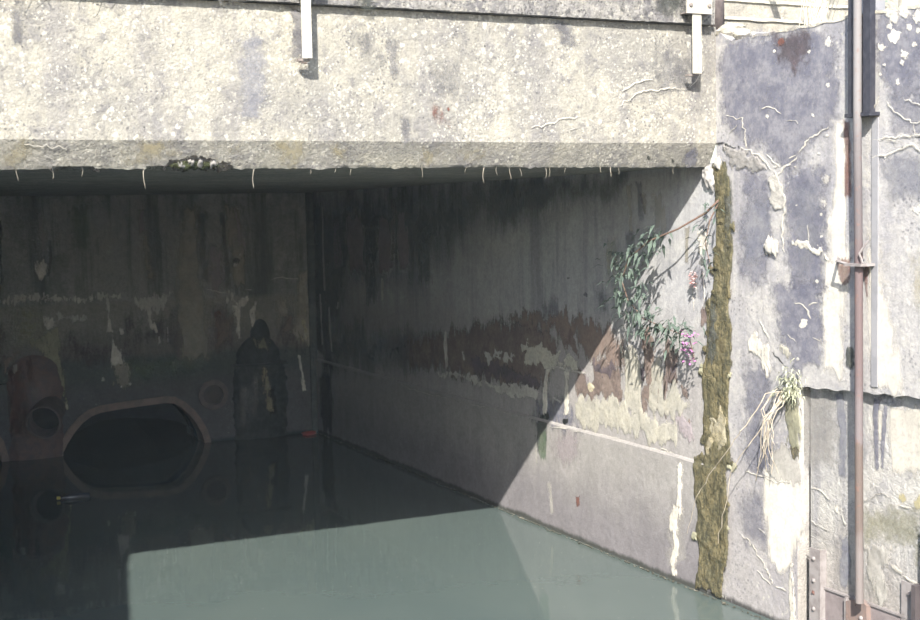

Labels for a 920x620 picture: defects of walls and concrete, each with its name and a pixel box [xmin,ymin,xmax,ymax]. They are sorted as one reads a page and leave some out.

crack [726,106,828,176]
crack [869,96,920,158]
damp [29,205,209,409]
damp [275,200,432,433]
peeling [407,306,694,448]
damp [692,228,719,366]
rust [846,347,854,368]
damp [669,462,684,577]